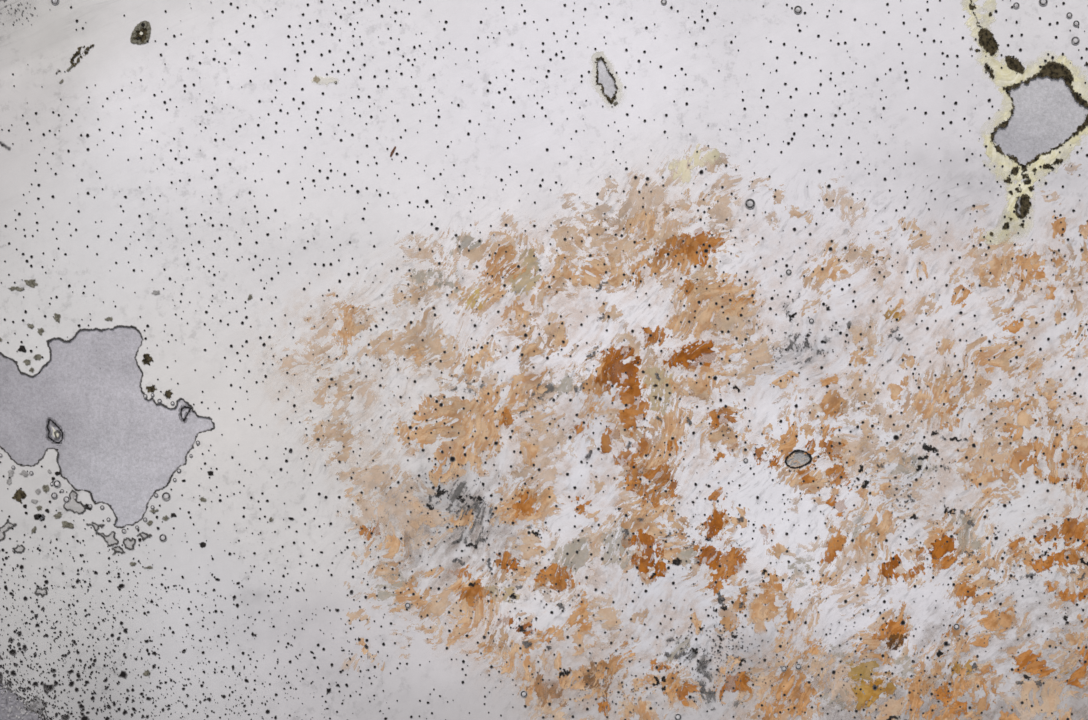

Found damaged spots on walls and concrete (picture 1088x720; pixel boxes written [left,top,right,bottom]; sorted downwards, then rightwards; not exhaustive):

spalling [130,21,151,45]
peeling [592,52,622,106]
crack [962,0,1025,79]
peeling [978,51,1088,182]
crack [981,164,1034,245]
peeling [8,279,38,291]
peeling [0,317,215,569]
corrosion [280,144,1088,720]
spalling [785,449,812,469]
spalling [0,668,56,720]